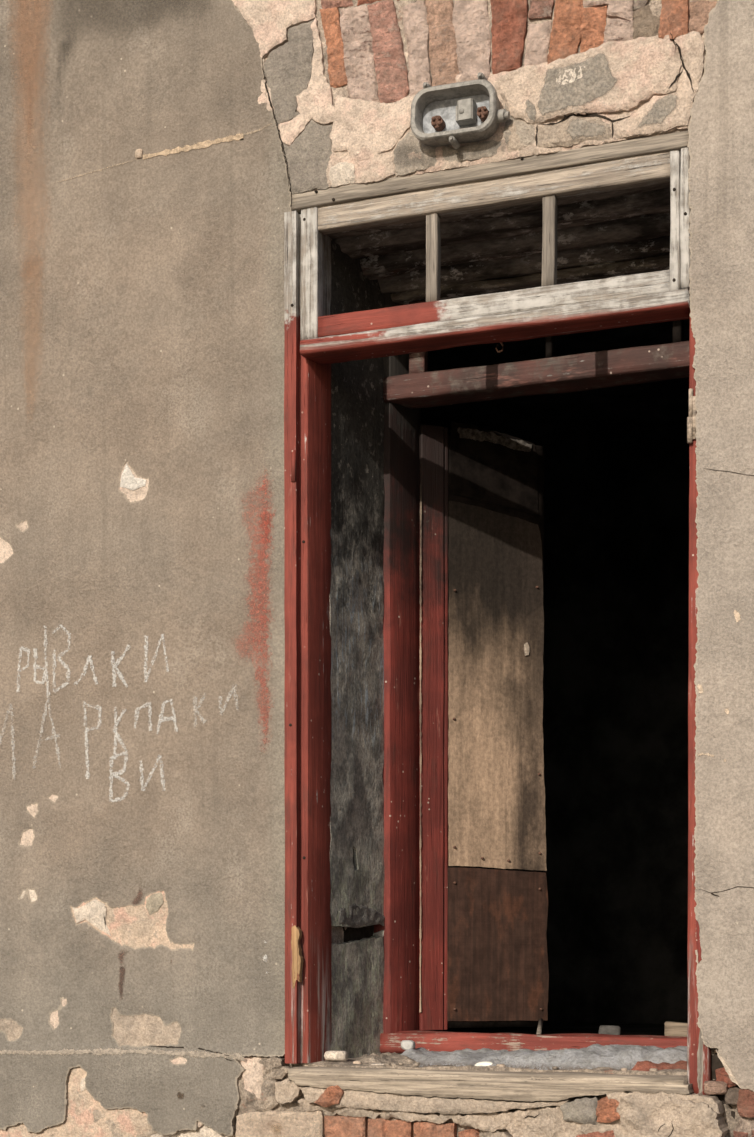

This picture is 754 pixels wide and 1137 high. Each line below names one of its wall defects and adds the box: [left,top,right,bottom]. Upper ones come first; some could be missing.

crack [669,33,694,92]
spalling [232,0,719,195]
crack [535,112,630,146]
spalling [119,462,149,502]
spalling [0,538,13,563]
peeling [71,891,194,950]
spalling [0,1019,23,1041]
spalling [49,998,67,1029]
peeling [111,1008,187,1064]
spalling [0,1029,754,1137]